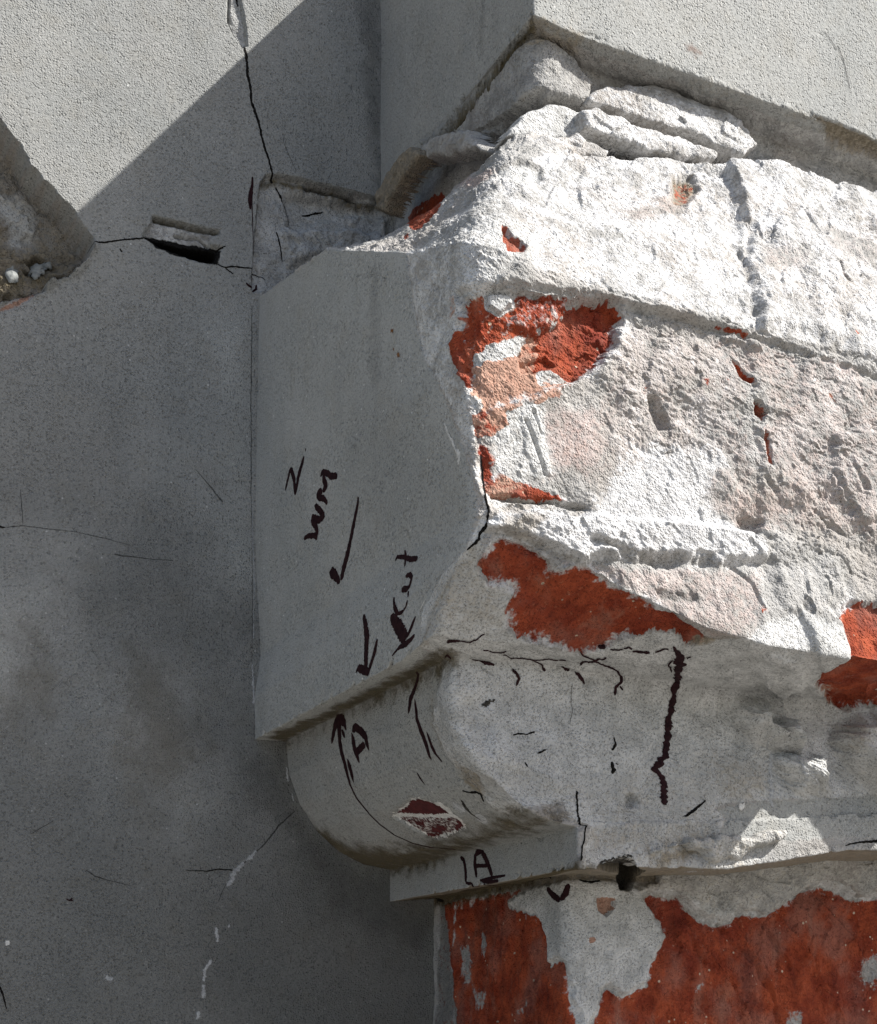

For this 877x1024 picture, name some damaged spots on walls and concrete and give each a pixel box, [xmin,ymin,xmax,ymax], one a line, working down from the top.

crack [214,0,323,280]
crack [88,237,144,252]
spalling [143,218,224,264]
spalling [251,32,877,712]
crack [467,454,490,550]
crack [444,634,706,817]
peeling [392,797,487,839]
crack [186,866,233,874]
peeling [508,858,666,1024]